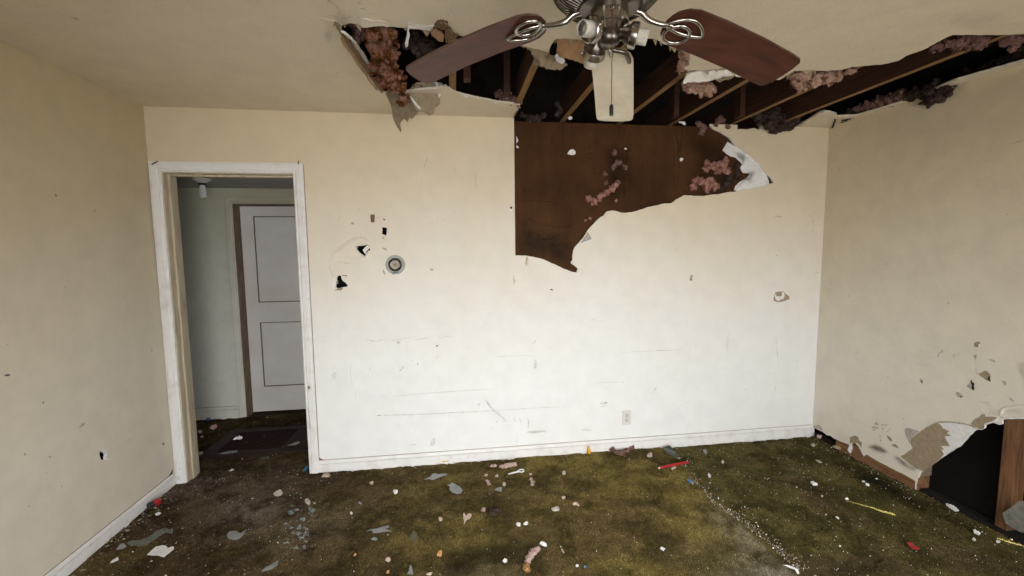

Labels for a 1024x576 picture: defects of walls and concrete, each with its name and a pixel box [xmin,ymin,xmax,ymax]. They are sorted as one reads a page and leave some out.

peeling [404,20,459,47]
peeling [521,39,585,70]
peeling [308,17,446,132]
peeling [682,60,741,84]
peeling [795,111,837,128]
peeling [723,142,769,191]
spalling [355,214,387,256]
spalling [332,275,348,290]
spalling [774,291,789,302]
peeling [955,359,1007,398]
spalling [848,436,867,456]
peeling [887,414,998,471]